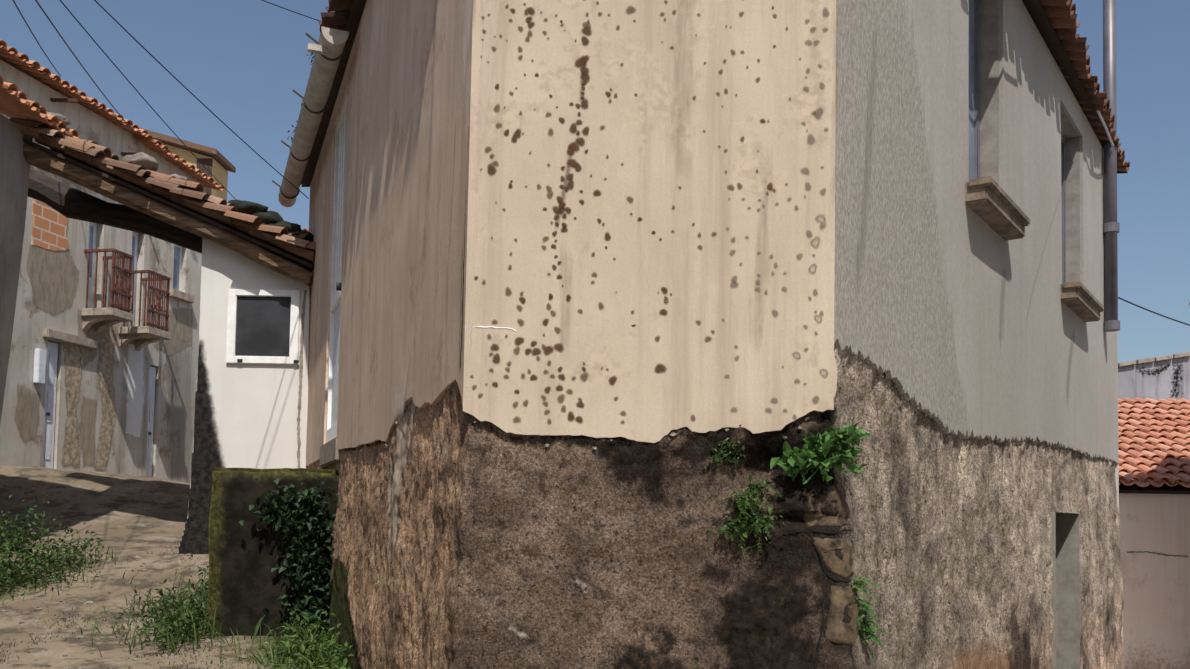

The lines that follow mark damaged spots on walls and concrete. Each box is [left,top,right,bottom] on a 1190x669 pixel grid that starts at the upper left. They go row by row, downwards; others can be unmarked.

damp [582,1,620,35]
damp [462,0,565,142]
damp [802,108,828,144]
damp [480,147,498,175]
damp [725,166,825,212]
damp [509,180,553,250]
damp [692,223,748,287]
damp [470,287,588,424]
peeling [510,431,697,453]
peeling [711,428,732,442]
peeling [746,417,809,442]
flaking render [803,490,860,644]